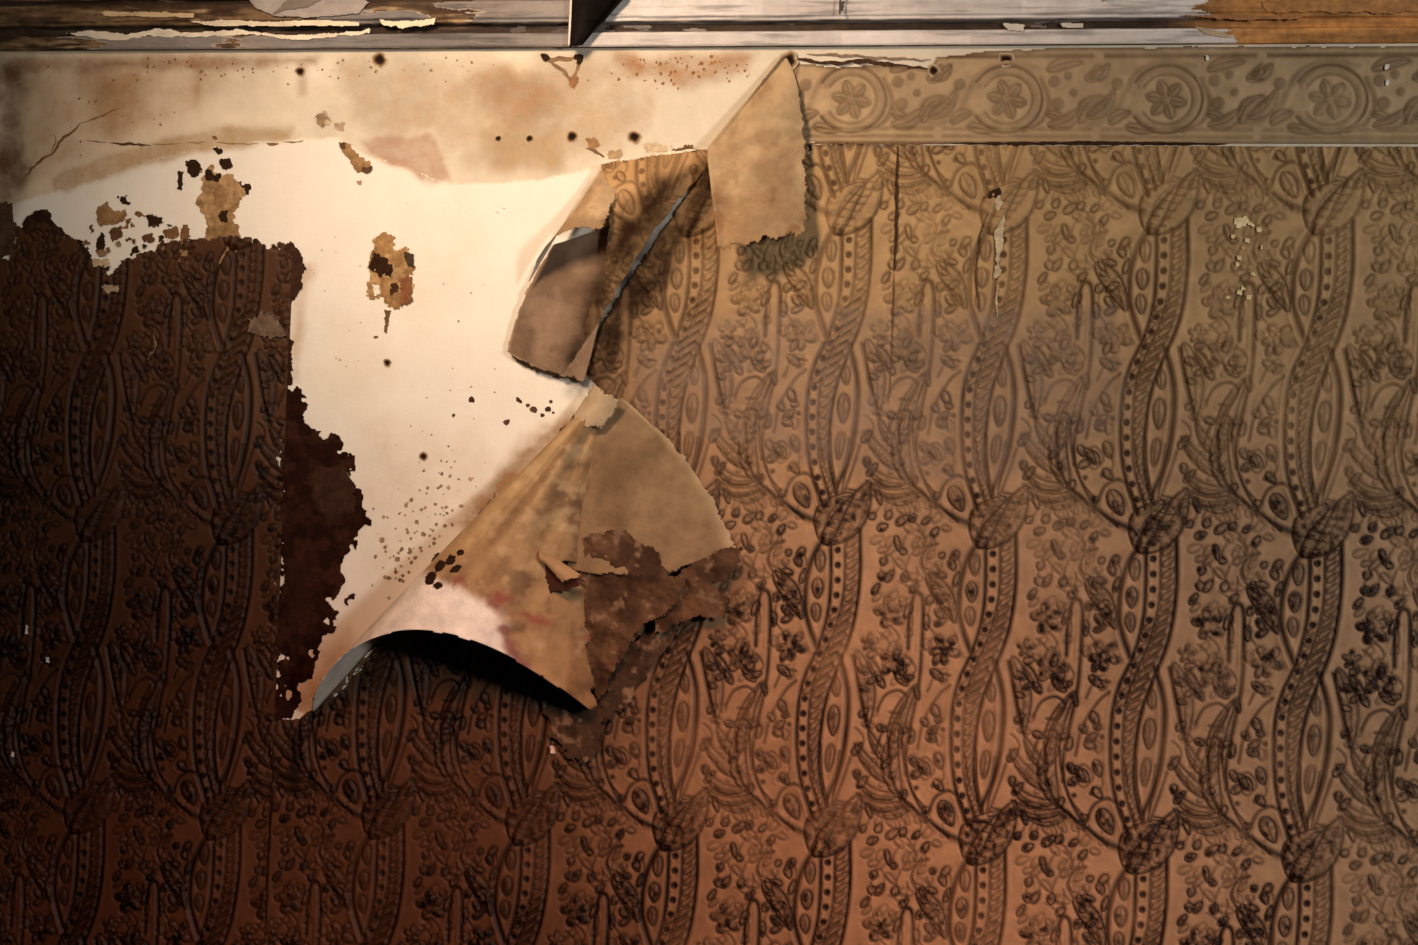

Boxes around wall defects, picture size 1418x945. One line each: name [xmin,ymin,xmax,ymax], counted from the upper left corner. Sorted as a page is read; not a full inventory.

peeling [66,0,436,40]
peeling [177,136,251,195]
peeling [313,111,372,185]
peeling [83,195,190,294]
peeling [286,241,307,303]
peeling [397,251,415,307]
peeling [312,465,357,520]